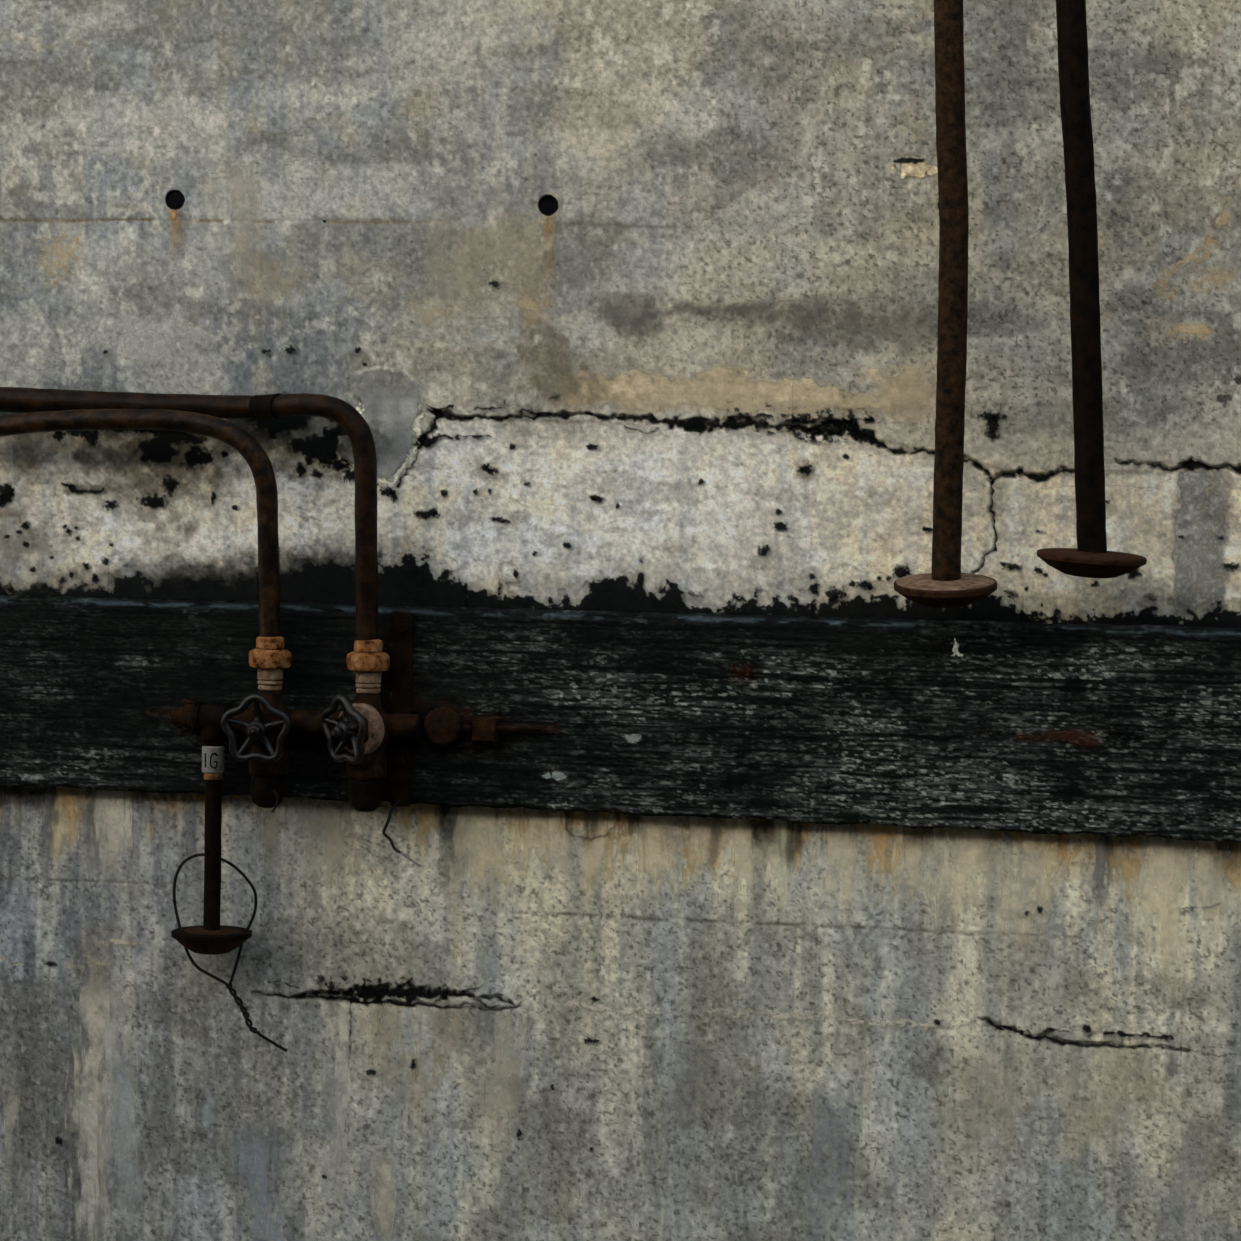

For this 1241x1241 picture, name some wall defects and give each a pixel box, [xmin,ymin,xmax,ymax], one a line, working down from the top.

flaking render [337,435,354,471]
flaking render [347,347,424,488]
crack [396,395,1075,574]
crack [1116,458,1241,474]
damp [0,786,132,880]
damp [406,804,1241,945]
crack [251,975,520,1075]
crack [981,1018,1235,1057]
damp [65,991,136,1235]
damp [322,1016,351,1162]
damp [371,1163,395,1231]